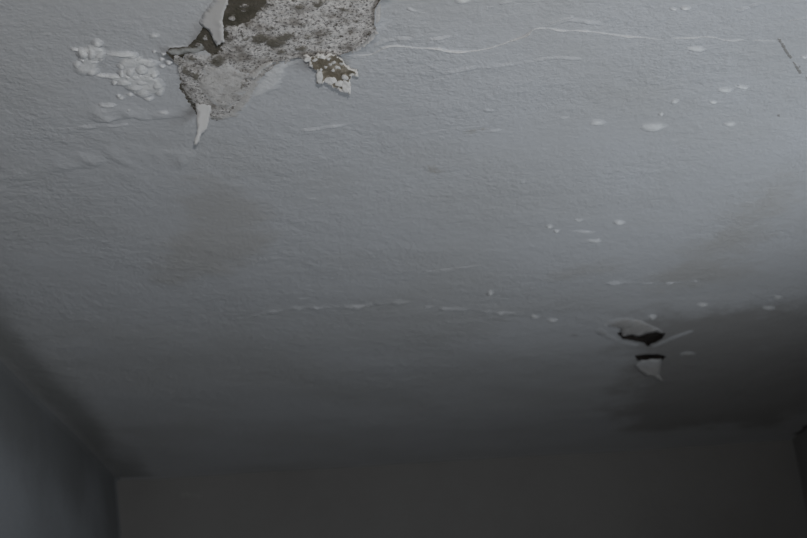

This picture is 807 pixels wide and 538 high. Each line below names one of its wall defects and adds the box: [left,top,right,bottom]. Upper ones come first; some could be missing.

spalling [167,0,381,145]
spalling [594,314,693,382]